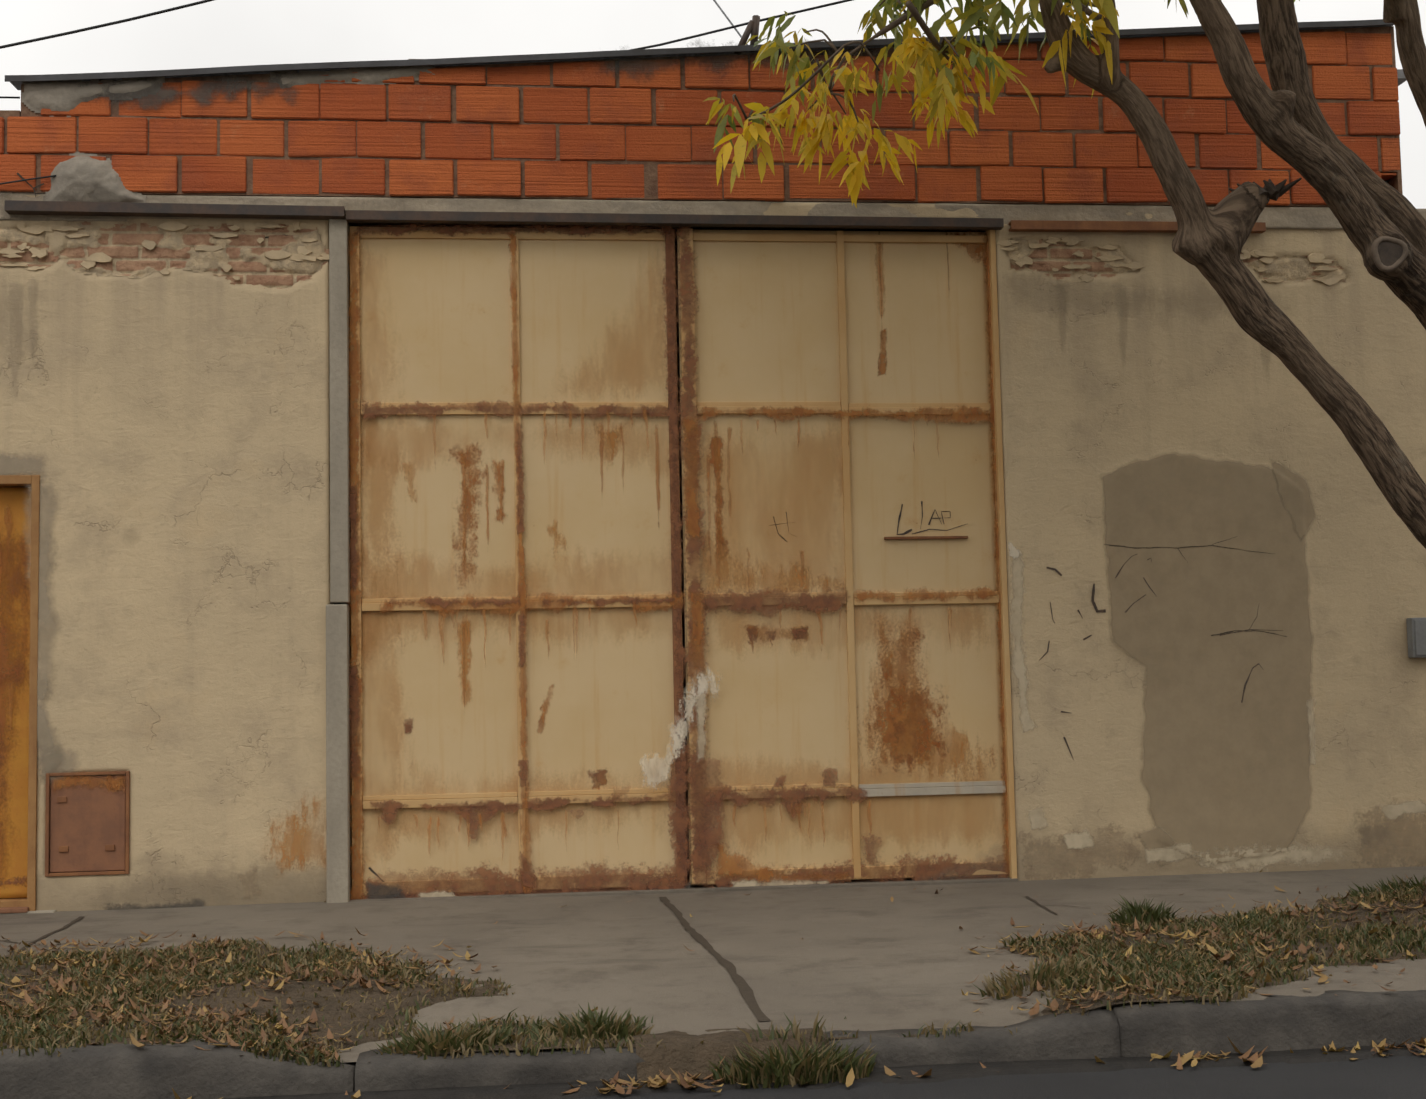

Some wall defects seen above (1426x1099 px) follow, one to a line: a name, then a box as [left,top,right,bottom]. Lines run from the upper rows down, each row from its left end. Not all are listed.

spalling [0,221,329,290]
spalling [996,236,1145,283]
spalling [1240,248,1350,286]
corrosion [348,223,1010,900]